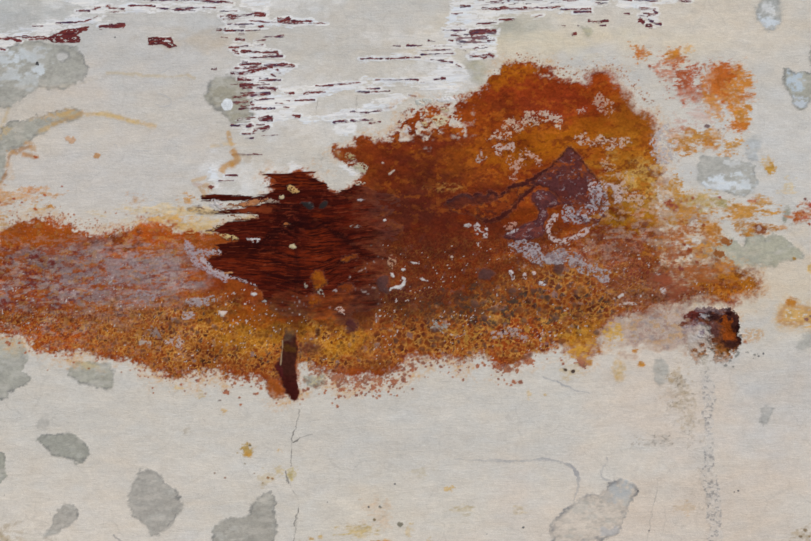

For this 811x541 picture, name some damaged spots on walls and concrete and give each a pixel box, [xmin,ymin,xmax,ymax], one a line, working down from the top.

peeling [751,0,788,34]
peeling [0,0,695,140]
peeling [780,45,811,111]
peeling [0,105,83,176]
peeling [205,163,239,193]
rust [0,41,811,414]
peeling [0,349,32,401]
peeling [0,450,9,484]
peeling [33,413,92,466]
peeling [125,467,188,537]
peeling [210,490,280,541]
peeling [548,475,642,541]